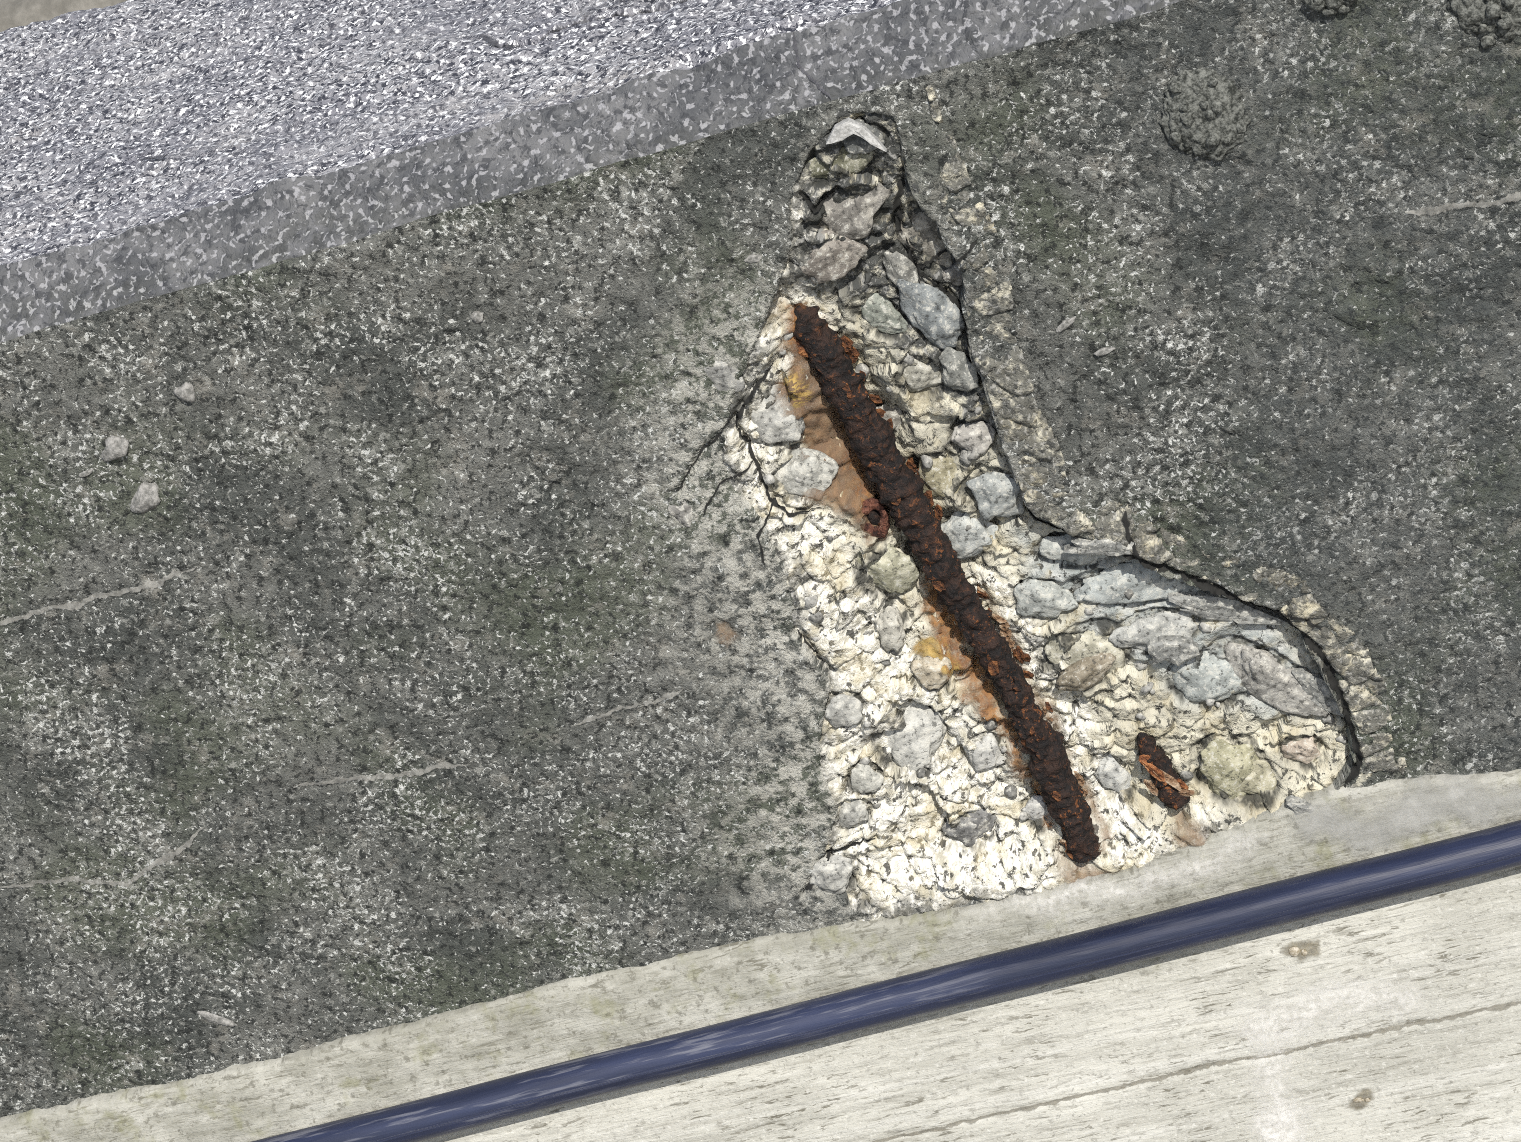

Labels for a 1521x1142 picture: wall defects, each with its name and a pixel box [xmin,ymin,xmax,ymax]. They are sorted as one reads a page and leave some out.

spalling [668,501,692,528]
crack [676,355,828,566]
rust [777,303,1109,882]
spalling [704,85,1407,921]
rust [1137,732,1204,846]